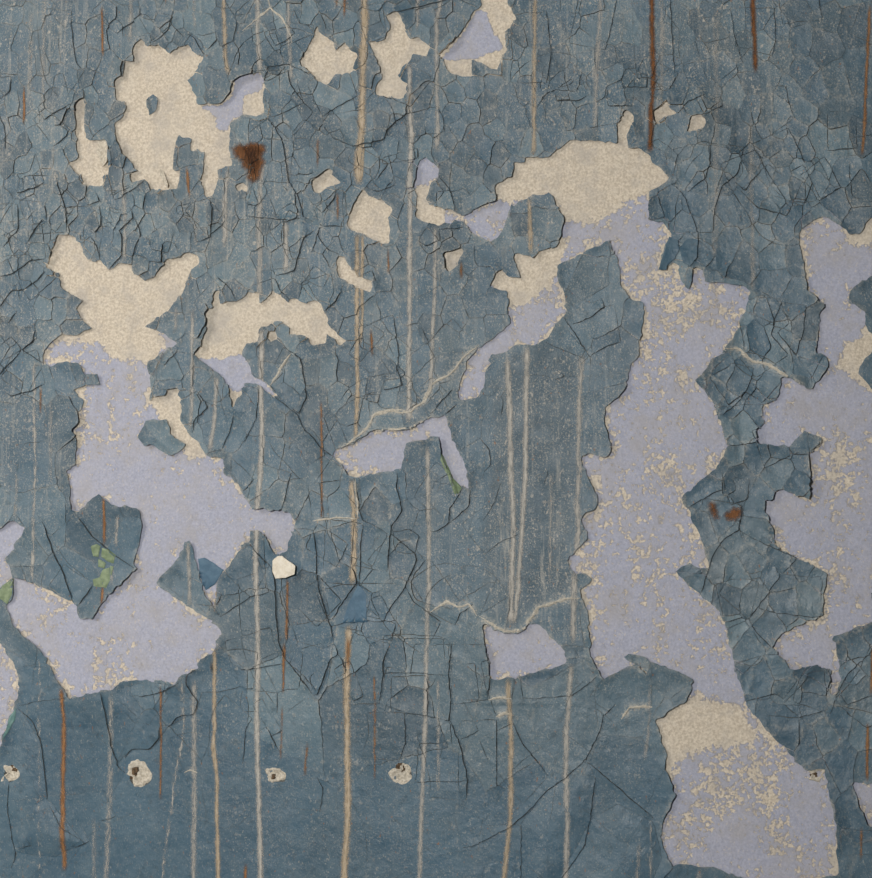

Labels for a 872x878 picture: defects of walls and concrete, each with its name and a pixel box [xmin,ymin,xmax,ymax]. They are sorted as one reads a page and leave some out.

peeling [61,19,273,208]
corrosion [233,143,264,182]
crack [242,0,410,295]
peeling [276,0,532,121]
crack [658,86,855,268]
corrosion [862,10,870,151]
crack [0,179,67,397]
peeling [0,158,404,699]
crack [223,315,479,456]
peeling [323,99,872,878]
crack [710,295,806,413]
spalling [127,759,152,787]